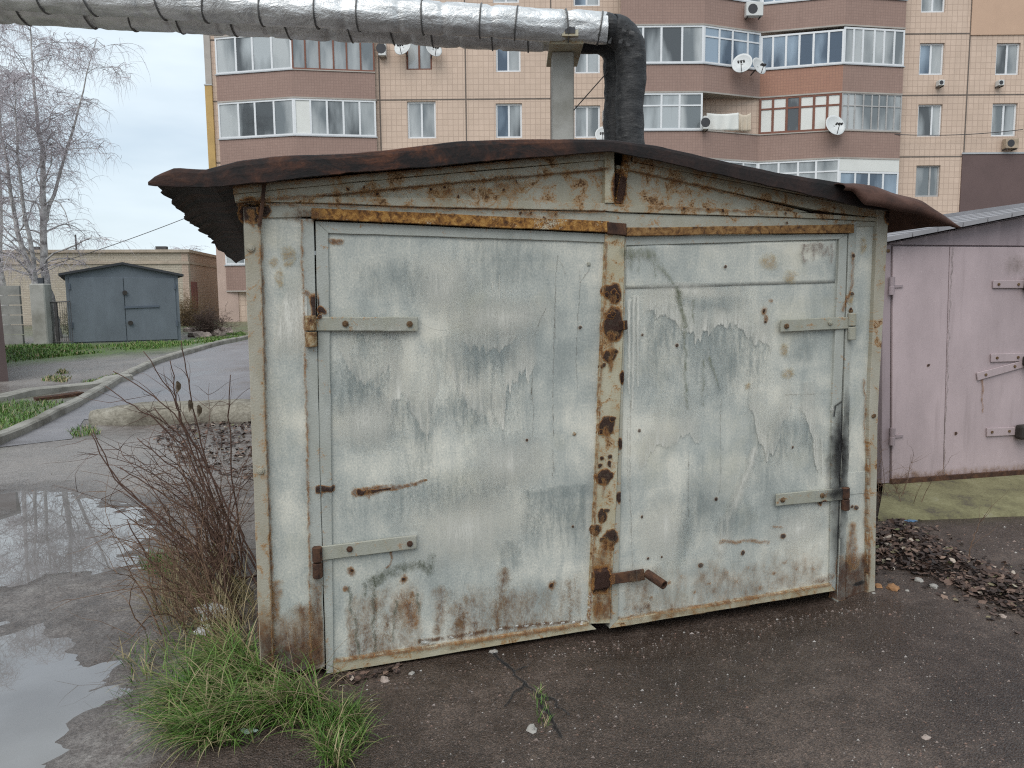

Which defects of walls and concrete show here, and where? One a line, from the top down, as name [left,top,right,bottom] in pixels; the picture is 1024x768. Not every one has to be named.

corrosion [236,154,790,230]
corrosion [257,241,871,683]
crack [492,646,569,737]